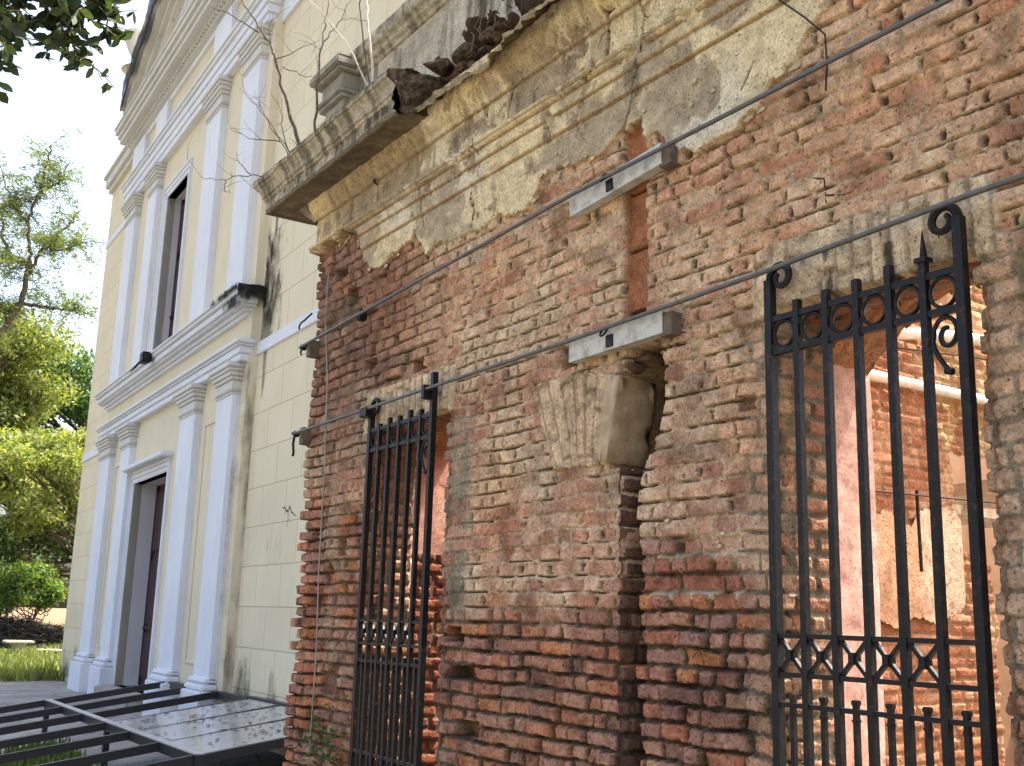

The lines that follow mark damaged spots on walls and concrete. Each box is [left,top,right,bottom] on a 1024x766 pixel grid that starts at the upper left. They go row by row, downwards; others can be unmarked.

peeling [447,113,483,152]
peeling [312,130,620,308]
water stain [210,217,281,339]
spalling [413,358,427,372]
spalling [558,345,581,371]
spalling [738,392,758,412]